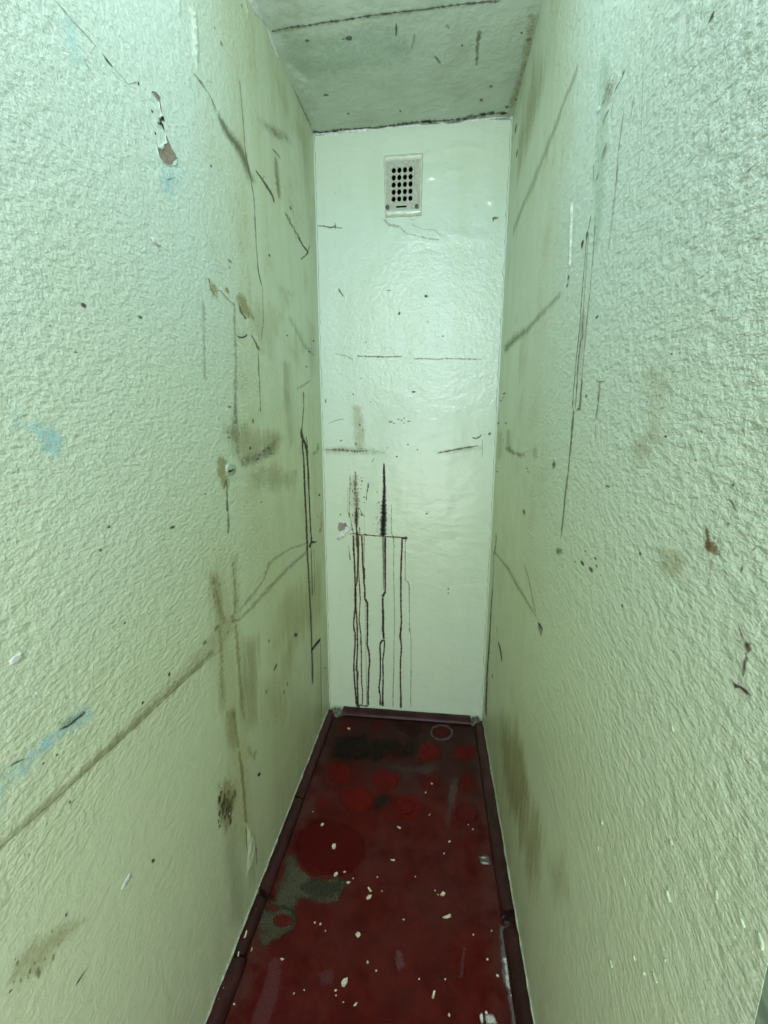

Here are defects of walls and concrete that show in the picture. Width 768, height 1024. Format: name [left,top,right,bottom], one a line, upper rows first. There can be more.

peeling [151,91,178,167]
corrosion [704,529,722,555]
water stain [218,768,240,831]